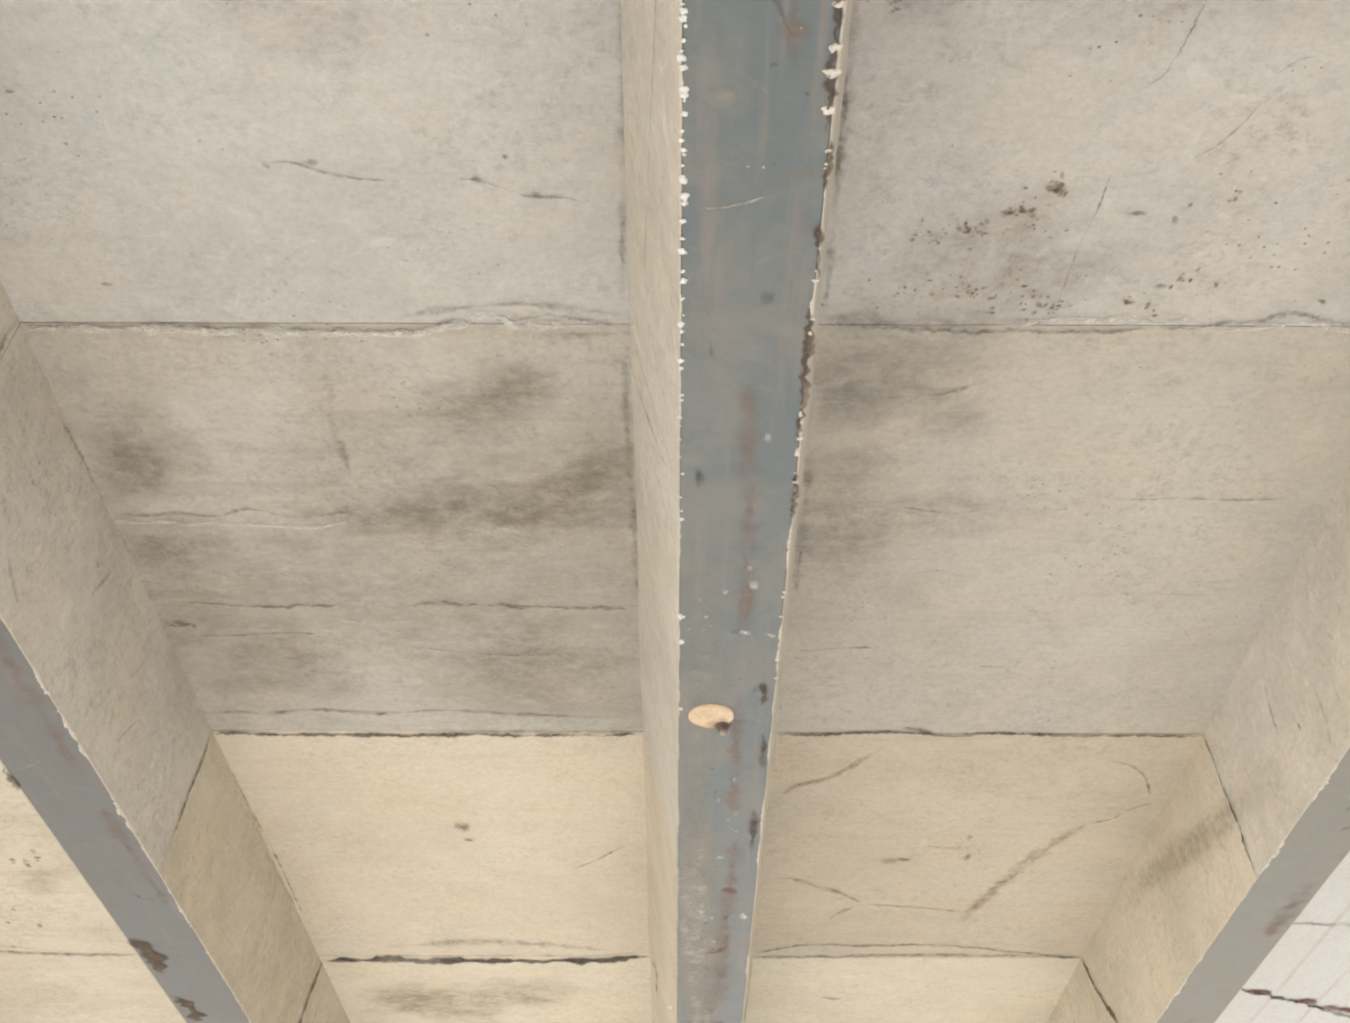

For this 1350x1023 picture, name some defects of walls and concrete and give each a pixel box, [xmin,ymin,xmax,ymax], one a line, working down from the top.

corrosion [825,0,844,120]
corrosion [814,228,824,273]
crack [839,318,1133,334]
crack [1172,314,1349,333]
corrosion [796,317,815,430]
corrosion [791,476,799,515]
crack [789,728,1253,867]
crack [1242,989,1350,1013]